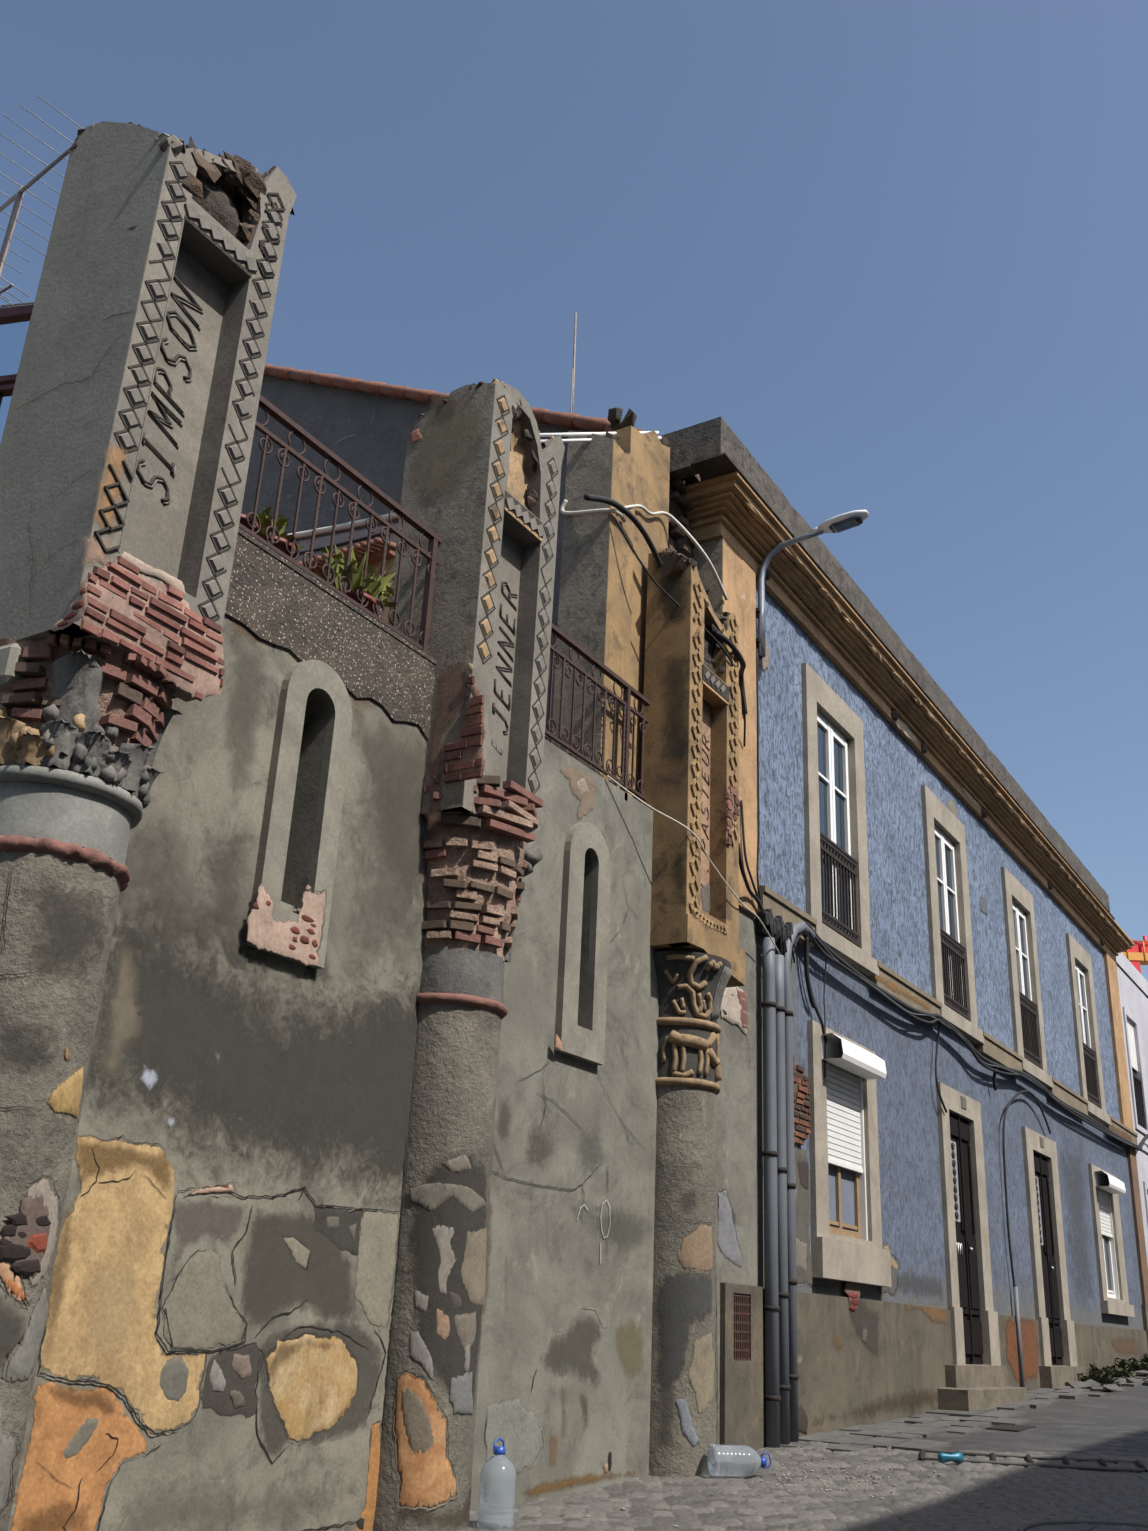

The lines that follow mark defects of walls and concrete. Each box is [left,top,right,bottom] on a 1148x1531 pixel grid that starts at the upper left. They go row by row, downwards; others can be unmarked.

flaking render [52,447,225,701]
flaking render [442,663,485,784]
crack [0,869,37,976]
spalling [48,1047,83,1117]
damp [33,840,419,1190]
flaking render [247,884,327,965]
flaking render [0,1134,364,1531]
flaking render [355,1154,487,1531]
flaking render [658,1185,745,1447]